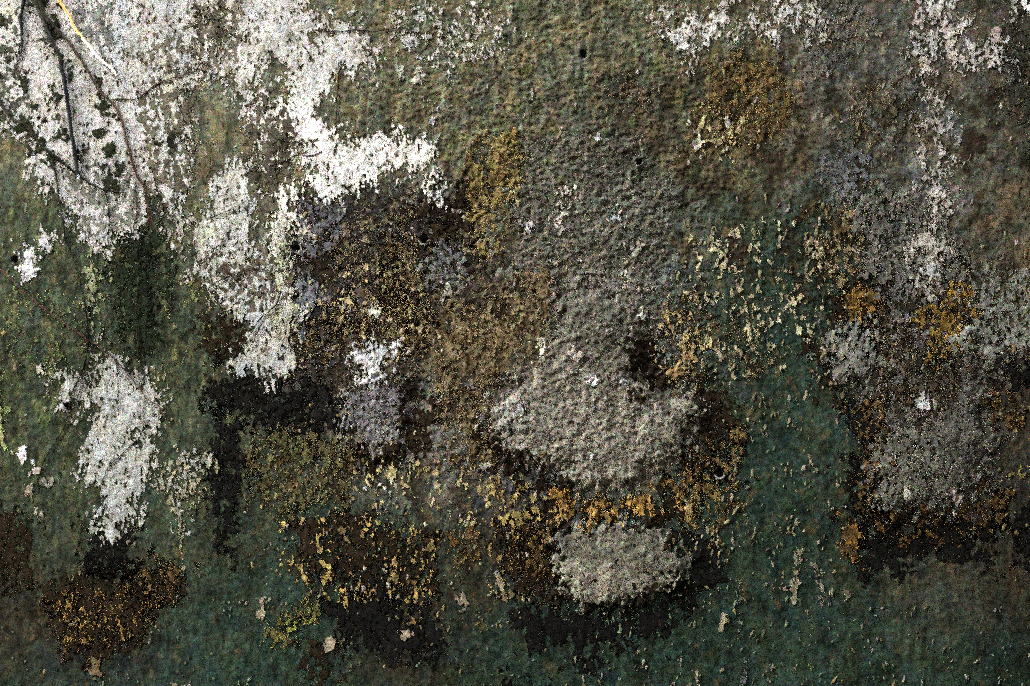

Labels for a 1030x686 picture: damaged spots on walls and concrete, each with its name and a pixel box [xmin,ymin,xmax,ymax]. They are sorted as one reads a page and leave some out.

peeling [0,0,513,449]
peeling [16,328,220,547]
flaking render [485,389,535,445]
peeling [57,584,160,645]
peeling [256,597,267,620]
peeling [277,450,566,641]